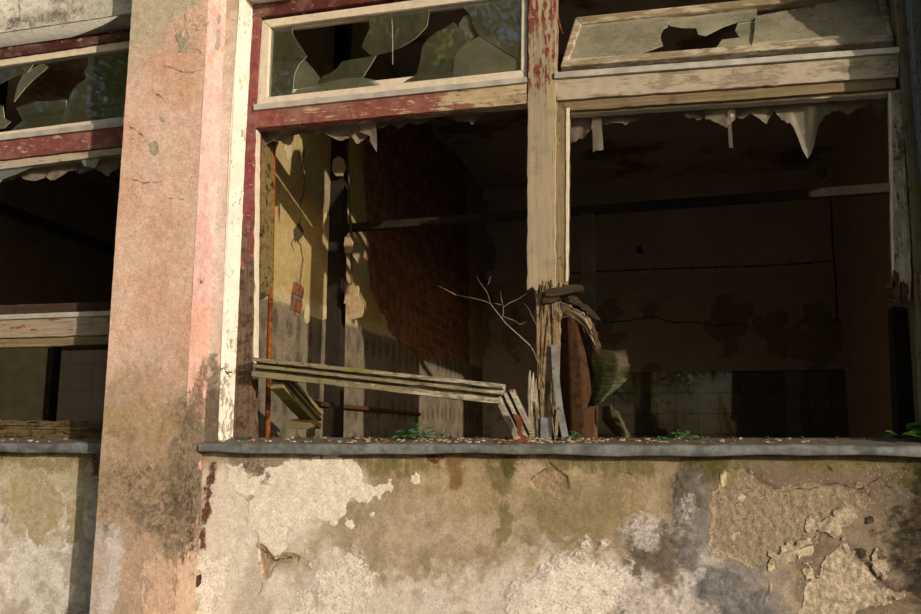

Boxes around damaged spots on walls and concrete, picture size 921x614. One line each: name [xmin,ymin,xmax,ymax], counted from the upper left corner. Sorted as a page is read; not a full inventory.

crack [290,149,305,315]
flaking render [344,121,470,365]
water stain [91,353,231,614]
peeling [224,455,394,579]
spalling [707,468,906,614]
water stain [872,463,921,603]